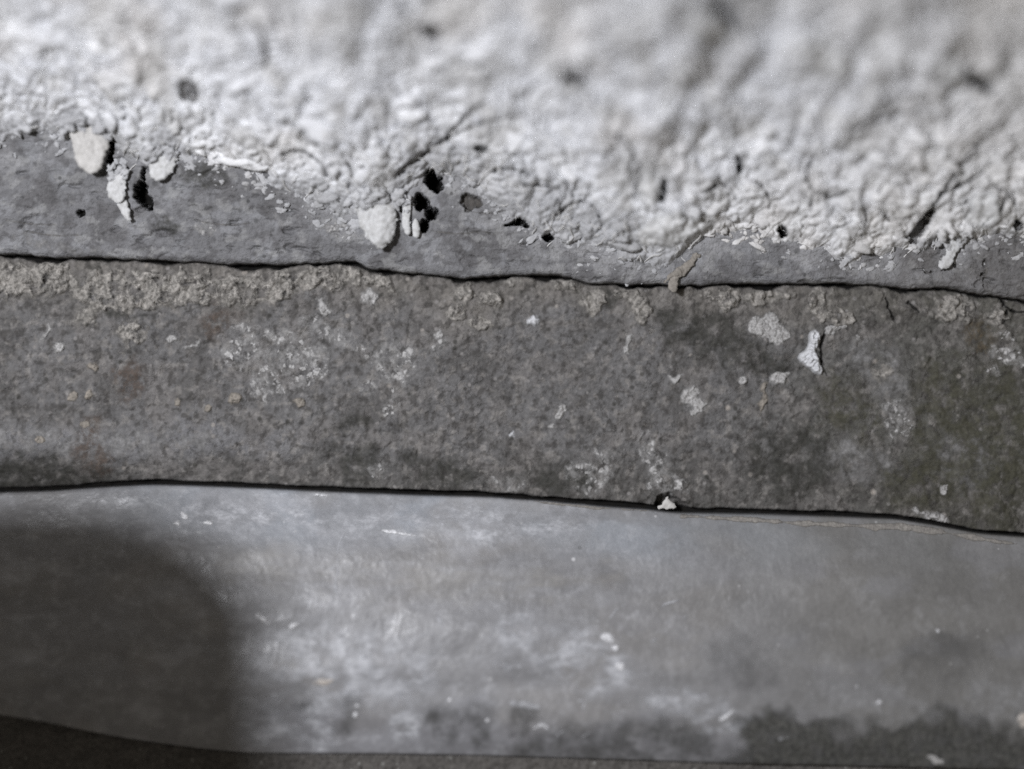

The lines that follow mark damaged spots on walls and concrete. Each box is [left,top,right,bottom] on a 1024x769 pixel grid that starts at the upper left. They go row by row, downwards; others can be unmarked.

peeling [58,109,180,221]
peeling [351,169,444,249]
crack [0,255,1024,321]
peeling [663,253,701,292]
peeling [935,221,974,269]
crack [0,479,1024,536]